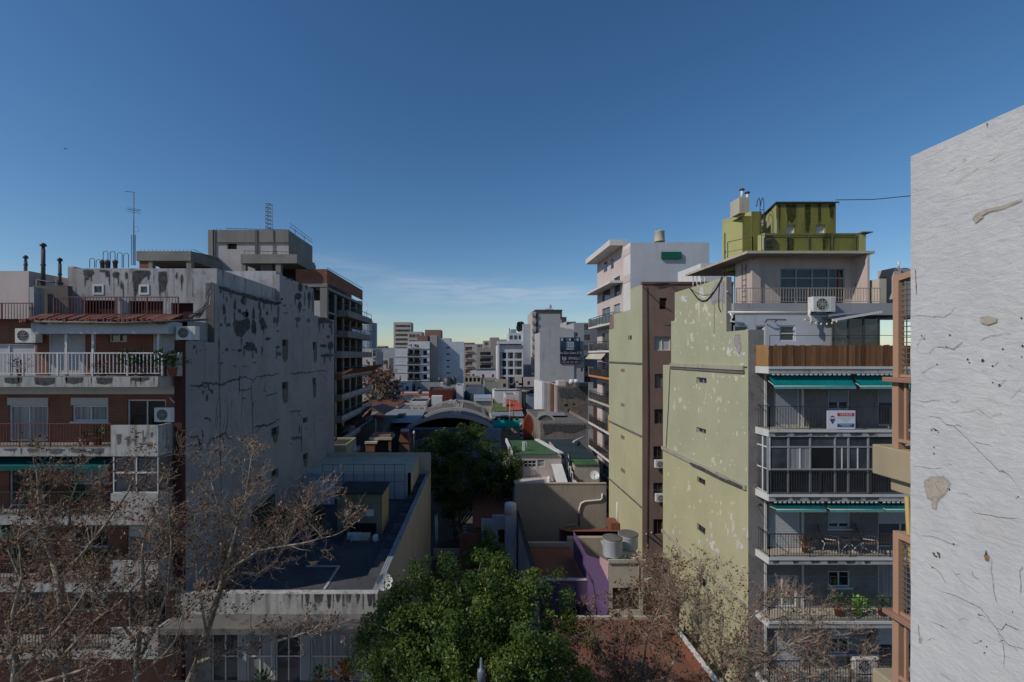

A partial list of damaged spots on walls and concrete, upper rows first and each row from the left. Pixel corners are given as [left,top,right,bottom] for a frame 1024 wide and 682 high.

damp [83,270,193,300]
damp [218,278,334,364]
crack [190,350,326,498]
peeling [673,285,747,472]
crack [916,307,1021,483]
peeling [672,481,748,563]
damp [301,594,375,608]
crack [927,565,1024,657]